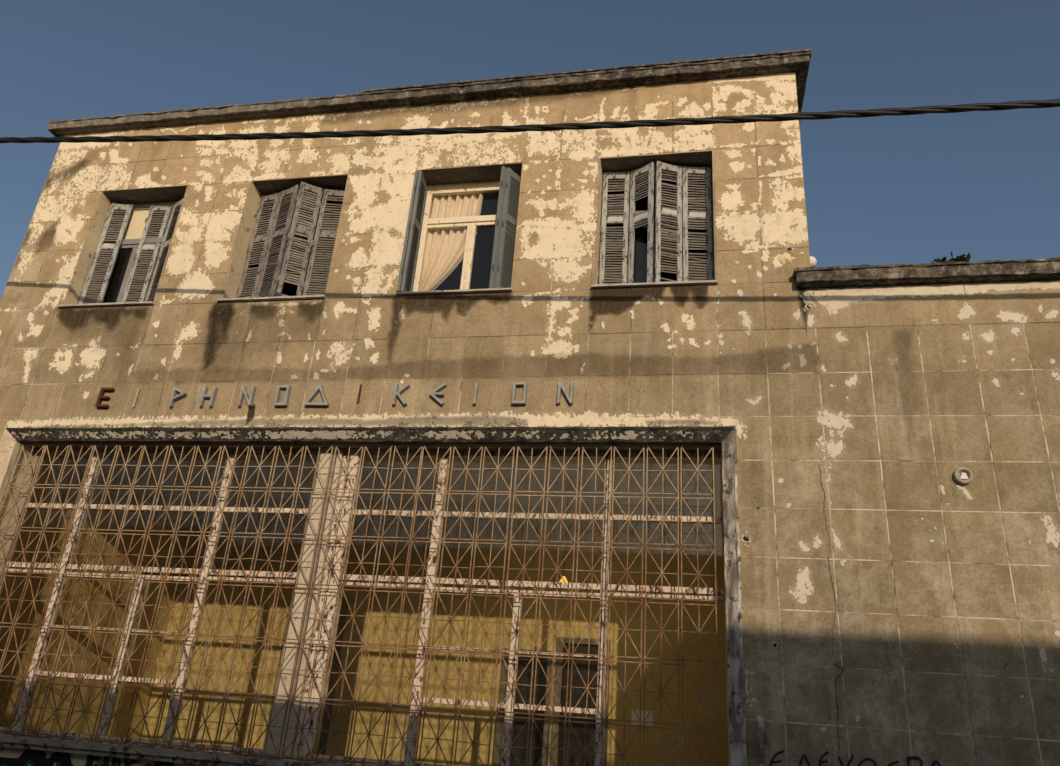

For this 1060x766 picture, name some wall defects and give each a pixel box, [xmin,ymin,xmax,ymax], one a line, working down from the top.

peeling [0,72,808,383]
peeling [48,336,140,399]
leakage [205,304,234,366]
peeling [782,341,816,369]
peeling [793,280,1060,355]
peeling [6,410,748,440]
peeling [815,410,854,505]
peeling [799,528,846,566]
peeling [1029,515,1060,548]
peeling [789,567,814,604]
crack [819,468,843,750]